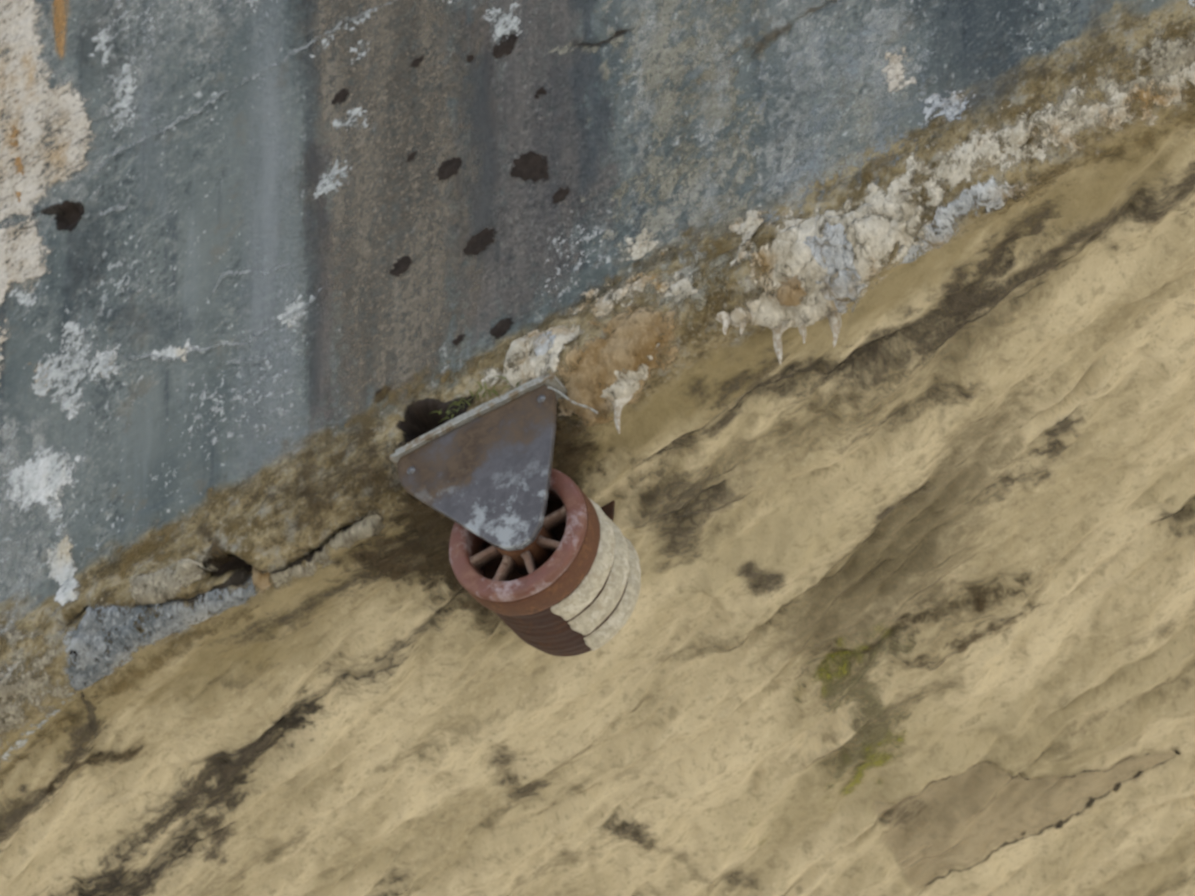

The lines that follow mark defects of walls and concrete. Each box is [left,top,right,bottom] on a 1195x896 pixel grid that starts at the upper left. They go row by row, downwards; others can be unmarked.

corrosion [53,0,68,58]
crack [747,0,837,55]
water stain [0,0,95,370]
water stain [175,0,1195,489]
water stain [29,312,120,420]
spalling [0,509,386,766]
water stain [69,429,511,896]
water stain [738,562,784,593]
water stain [791,401,1080,671]
water stain [0,745,143,852]
water stain [492,748,551,799]
flaking render [919,749,1180,895]